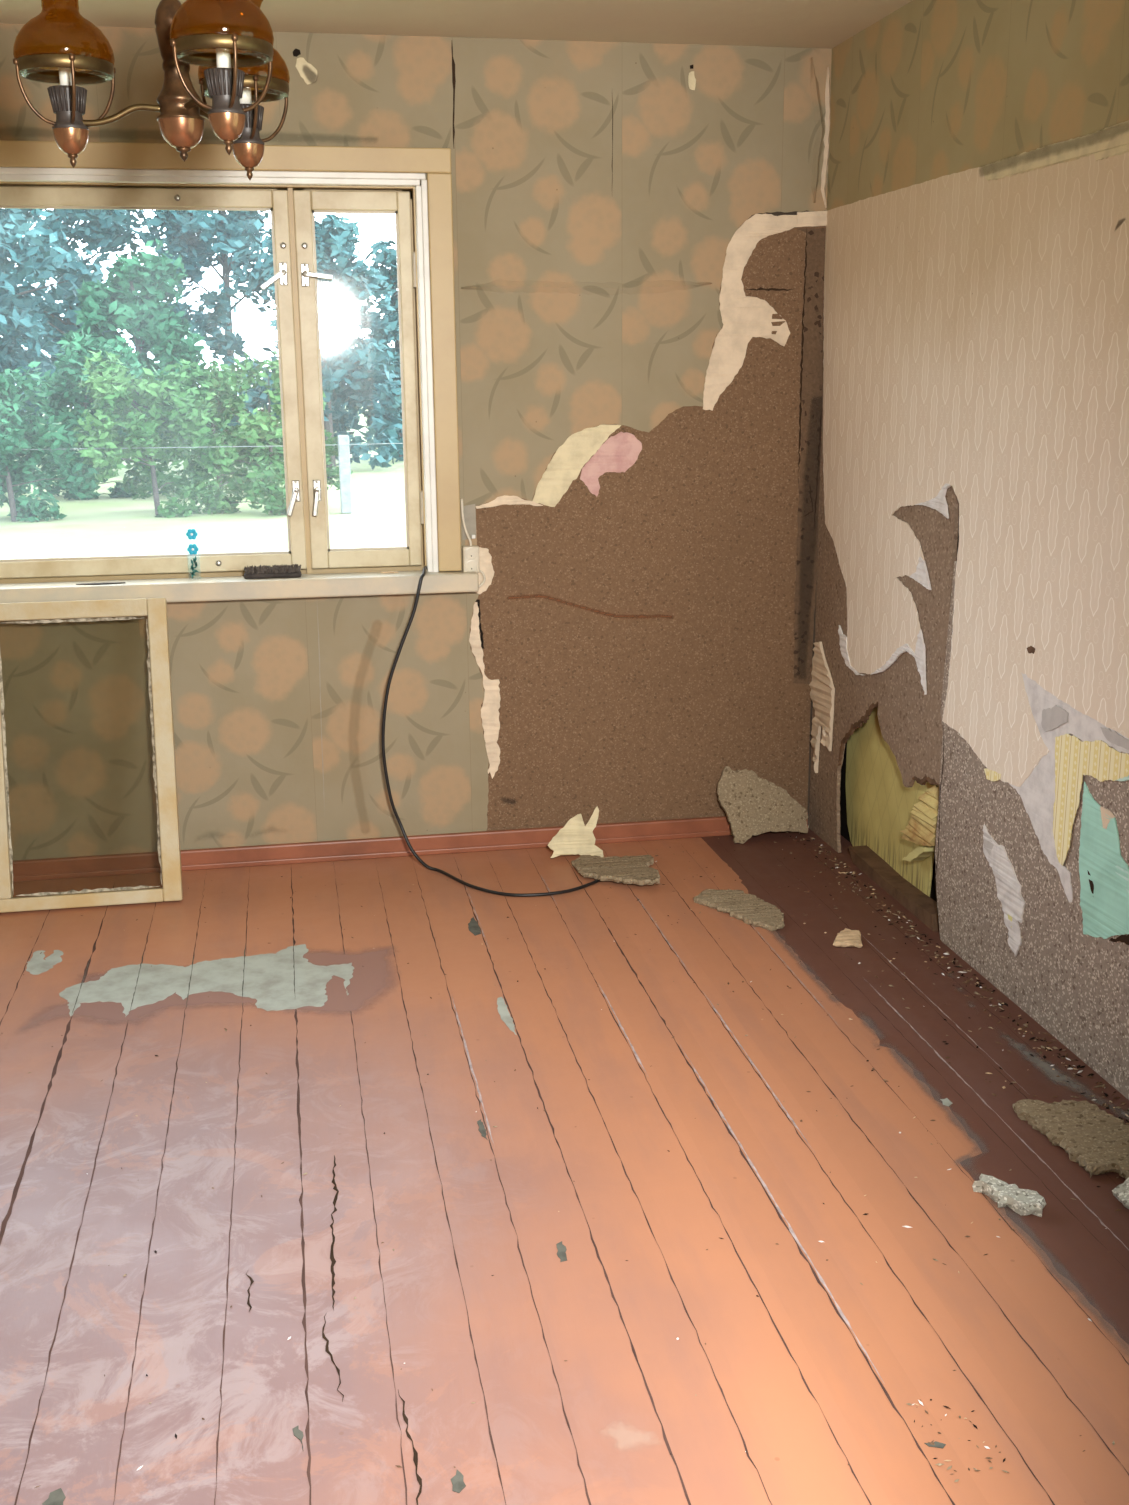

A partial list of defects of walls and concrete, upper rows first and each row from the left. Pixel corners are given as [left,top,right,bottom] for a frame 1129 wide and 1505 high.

spalling [838,701,939,932]
peeling [37,942,389,1022]
crack [322,1155,344,1402]
crack [398,1390,422,1505]